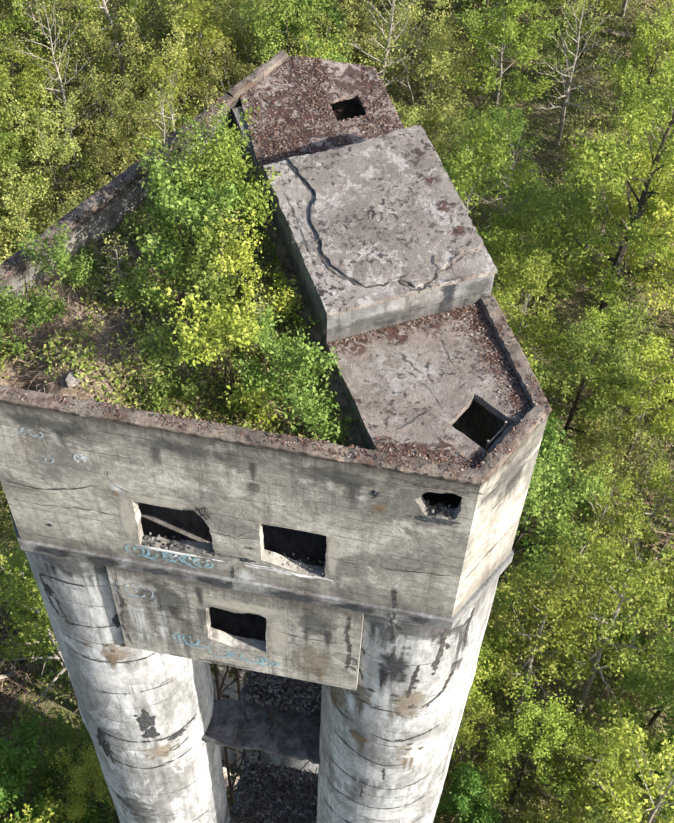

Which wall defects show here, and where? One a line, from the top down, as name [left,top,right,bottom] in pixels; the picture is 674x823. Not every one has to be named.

crack [279,164,472,291]
crack [39,574,193,664]
damp [335,604,467,687]